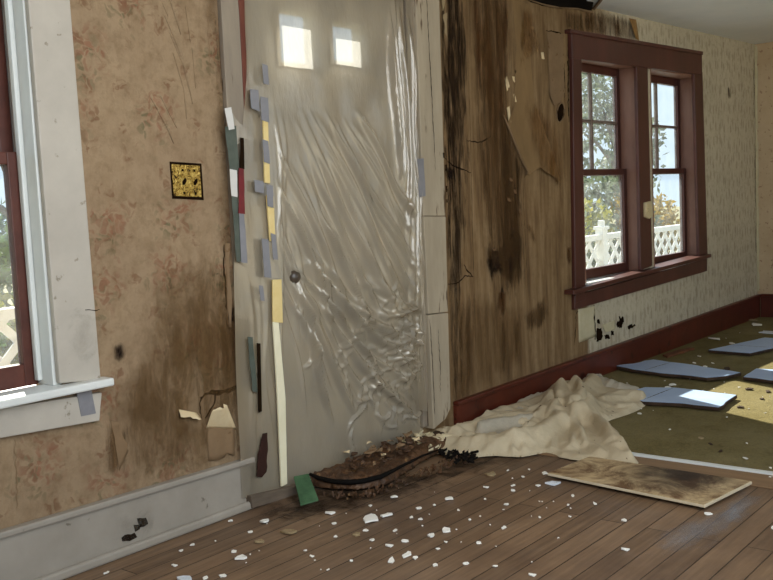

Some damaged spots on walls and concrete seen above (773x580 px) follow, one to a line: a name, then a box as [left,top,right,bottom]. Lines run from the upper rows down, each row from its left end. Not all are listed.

leakage [442,0,470,385]
leakage [474,0,522,314]